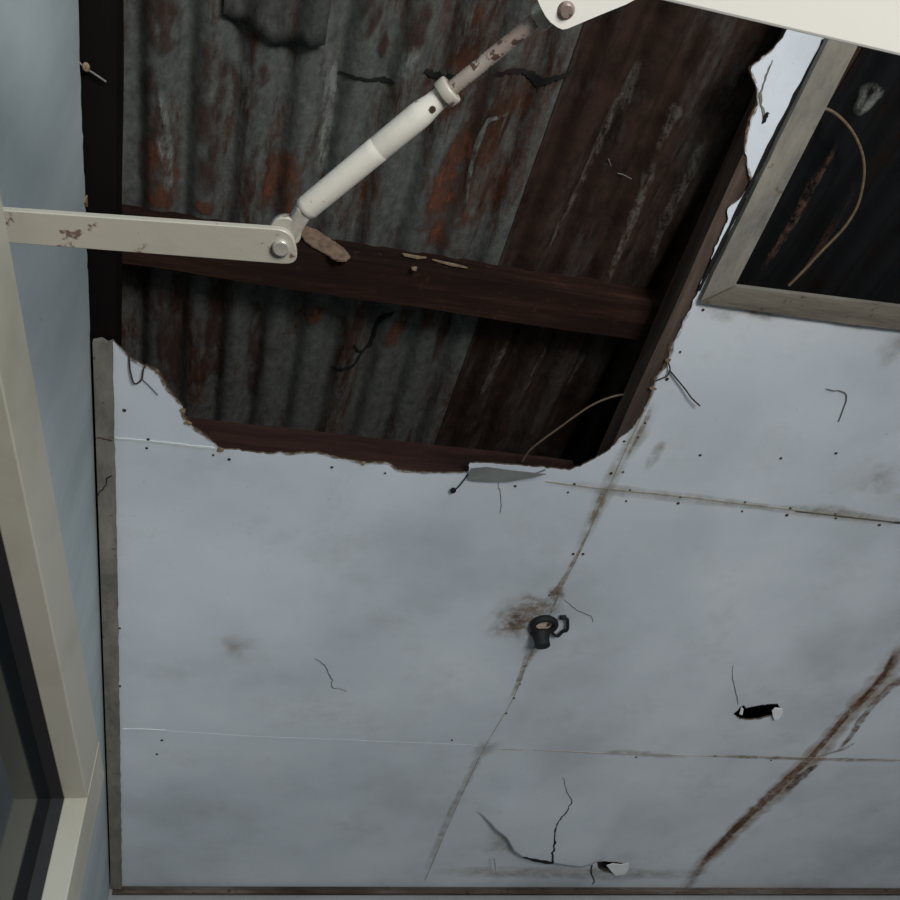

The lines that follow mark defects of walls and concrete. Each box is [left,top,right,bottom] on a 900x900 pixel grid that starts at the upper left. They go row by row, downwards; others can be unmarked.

peeling [301,226,350,262]
peeling [402,253,468,271]
spalling [151,367,209,439]
peeling [469,467,546,482]
peeling [772,707,783,720]
crack [523,778,572,864]
peeling [607,863,629,876]